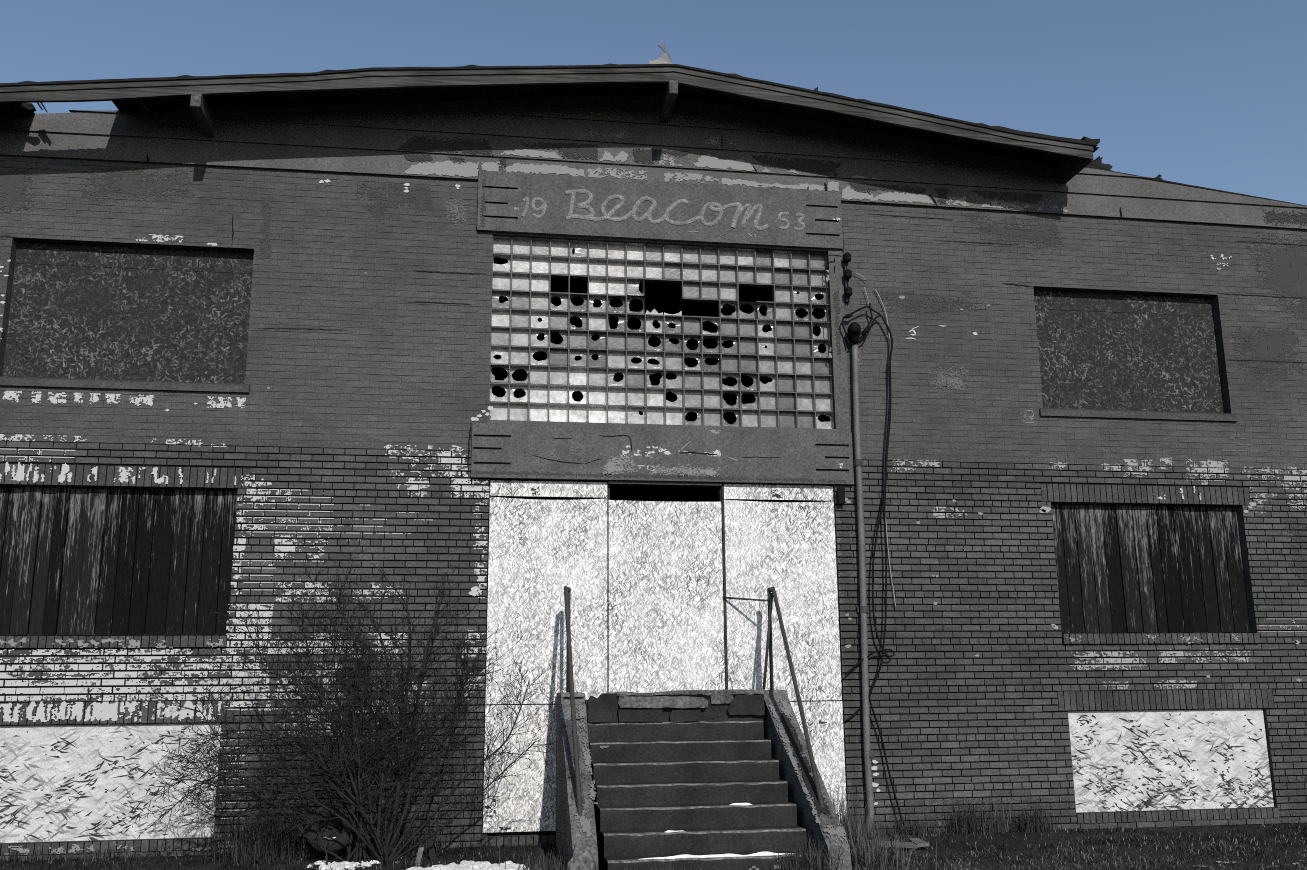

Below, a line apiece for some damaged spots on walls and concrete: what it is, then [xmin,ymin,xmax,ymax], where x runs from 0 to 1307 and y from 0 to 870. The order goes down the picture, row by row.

peeling [404,131,1068,212]
peeling [2,391,169,411]
peeling [194,396,246,409]
peeling [0,434,86,462]
peeling [151,438,227,447]
peeling [891,459,940,473]
peeling [1101,438,1307,513]
peeling [0,445,489,742]
peeling [1070,648,1250,689]
peeling [219,732,245,819]